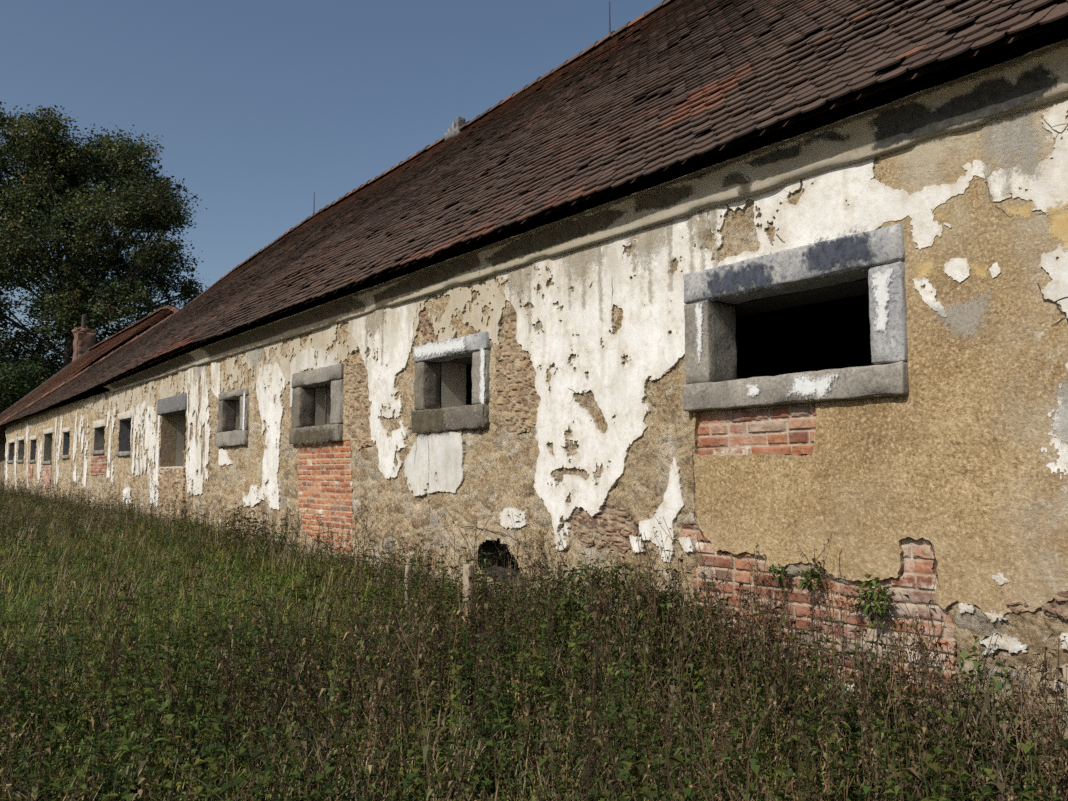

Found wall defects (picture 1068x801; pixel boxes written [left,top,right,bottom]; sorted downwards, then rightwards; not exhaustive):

peeling [4,100,1068,551]
damp [107,40,1068,434]
flaking render [629,457,957,709]
flaking render [1004,600,1028,613]
flaking render [1041,591,1068,619]